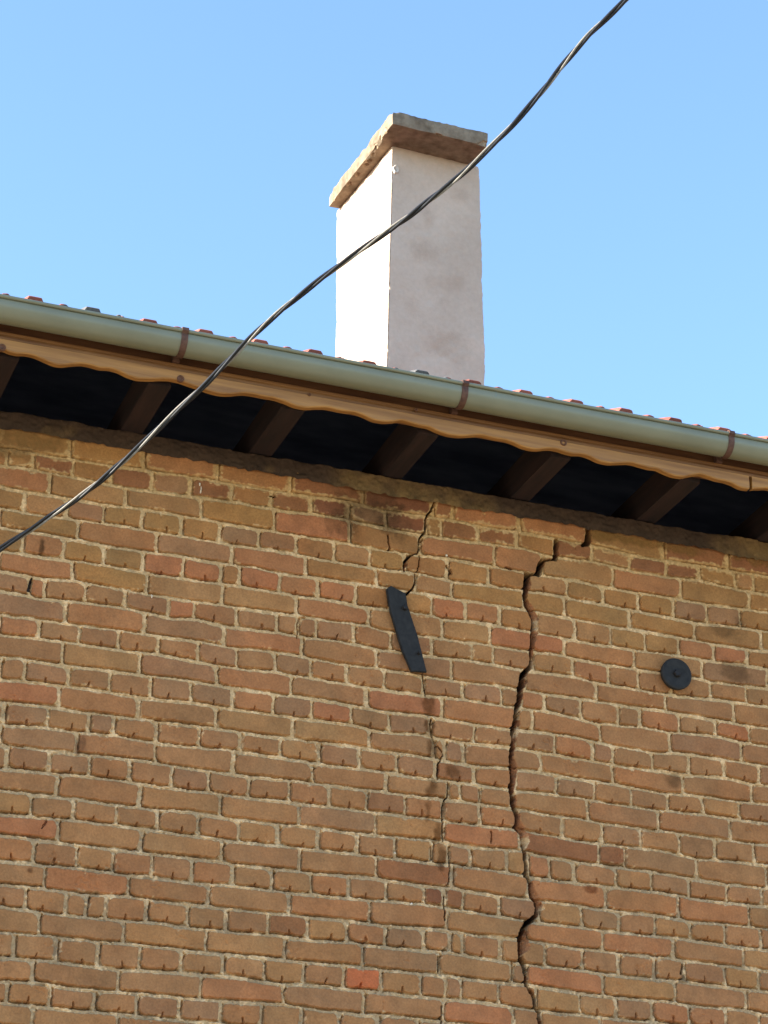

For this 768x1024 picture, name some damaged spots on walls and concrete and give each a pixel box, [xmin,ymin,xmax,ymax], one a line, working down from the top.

crack [387,502,434,596]
crack [421,673,451,921]
crack [490,529,592,1024]